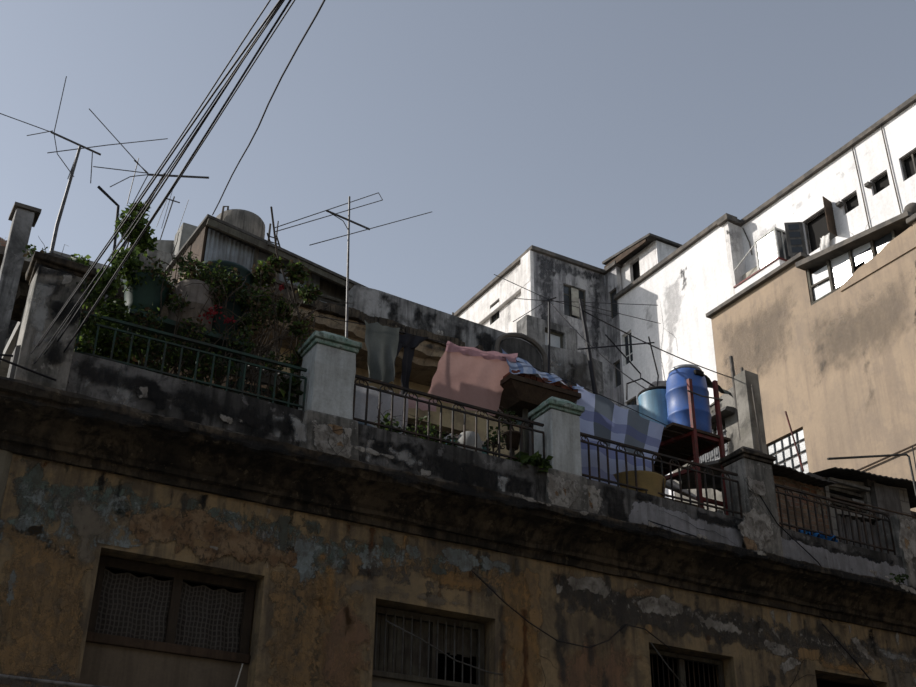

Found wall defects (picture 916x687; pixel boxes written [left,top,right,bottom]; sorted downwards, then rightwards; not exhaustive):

water stain [382,295,402,333]
water stain [414,308,443,336]
water stain [476,332,494,352]
water stain [538,256,600,356]
water stain [67,359,352,467]
flaking render [291,417,394,459]
water stain [366,439,541,509]
flaking render [738,507,773,556]
peeling [431,547,511,575]
flaking render [556,576,610,599]
flaking render [626,587,683,633]
flaking render [698,616,744,643]